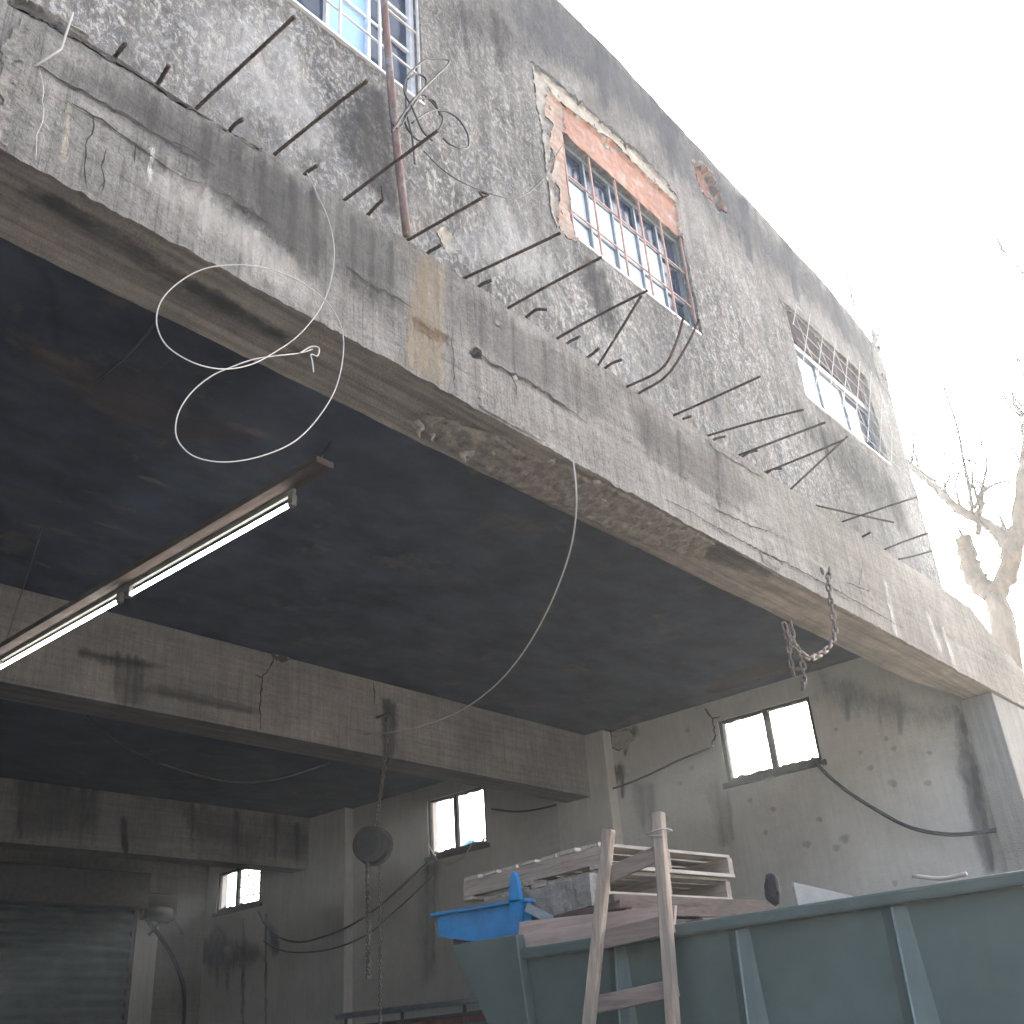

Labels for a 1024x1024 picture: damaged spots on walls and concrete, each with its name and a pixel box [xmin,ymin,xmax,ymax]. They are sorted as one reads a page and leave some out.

crack [34,63,274,230]
peeling [462,66,685,288]
spalling [692,161,727,213]
spalling [495,256,603,328]
spalling [556,289,648,369]
spalling [481,403,546,441]
spalling [418,412,716,561]
crack [256,659,274,729]
crack [704,708,720,746]
damp [959,714,993,870]